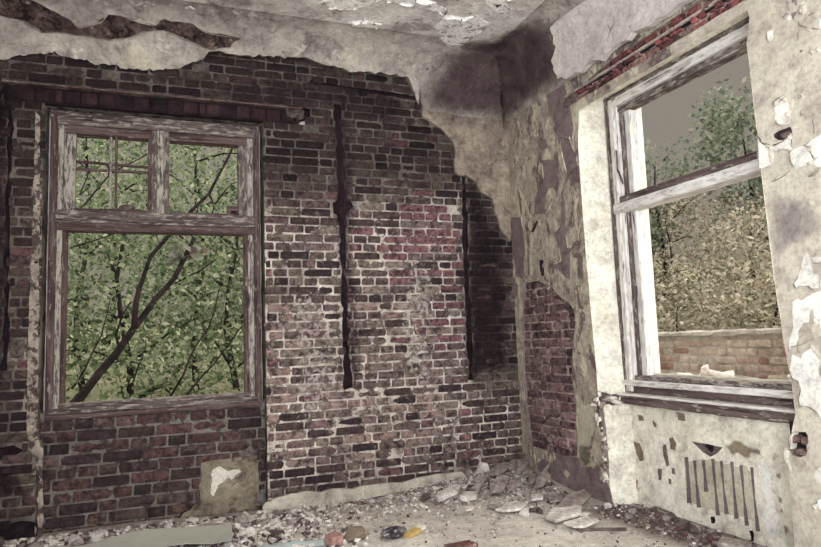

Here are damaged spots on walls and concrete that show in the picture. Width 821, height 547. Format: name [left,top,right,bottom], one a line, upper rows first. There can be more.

peeling [0,0,242,51]
peeling [318,0,490,47]
peeling [782,0,821,40]
damp [431,29,553,119]
peeling [757,92,821,177]
spalling [421,0,744,505]
peeling [787,252,821,418]
spalling [784,421,809,471]